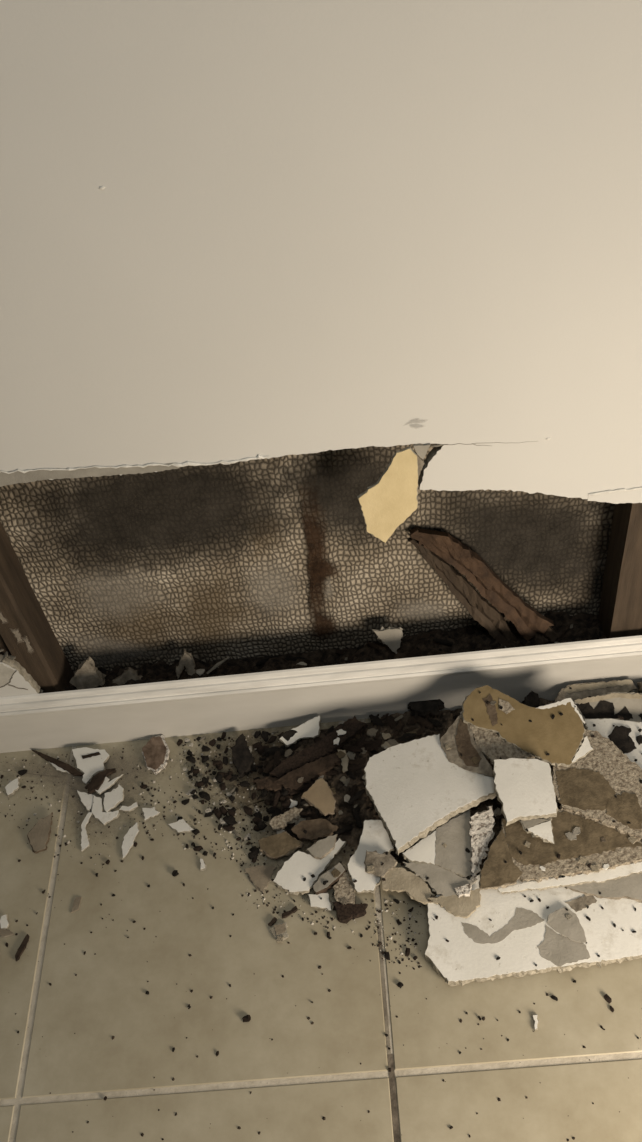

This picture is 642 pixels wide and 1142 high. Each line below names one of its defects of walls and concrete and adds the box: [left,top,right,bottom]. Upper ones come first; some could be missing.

leakage [41,451,392,566]
spalling [0,443,642,678]
leakage [445,493,608,589]
spalling [0,655,42,694]